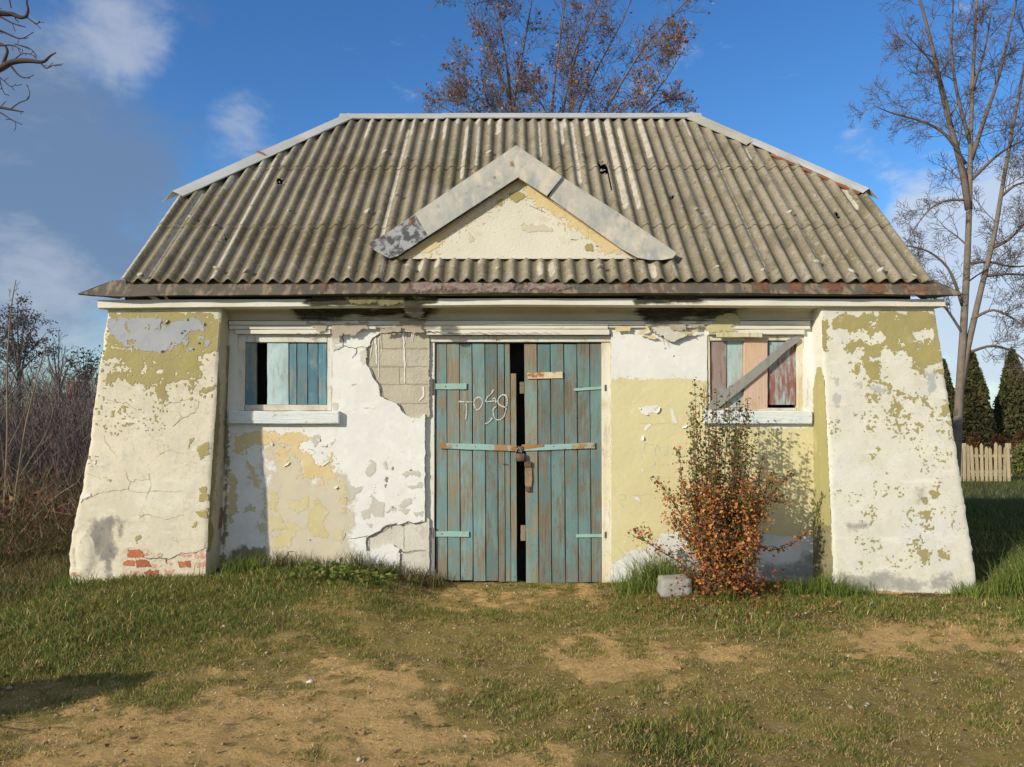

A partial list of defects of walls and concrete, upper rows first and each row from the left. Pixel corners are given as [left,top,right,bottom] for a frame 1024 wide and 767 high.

peeling [402,179,621,258]
rust [865,283,886,293]
peeling [95,311,220,436]
crack [297,333,415,422]
flaking render [306,317,430,419]
flaking render [615,320,708,357]
water stain [90,517,122,578]
crack [86,399,196,520]
flaking render [120,535,207,578]
flaking render [226,425,430,575]
crack [343,521,421,551]
peeling [708,310,965,573]